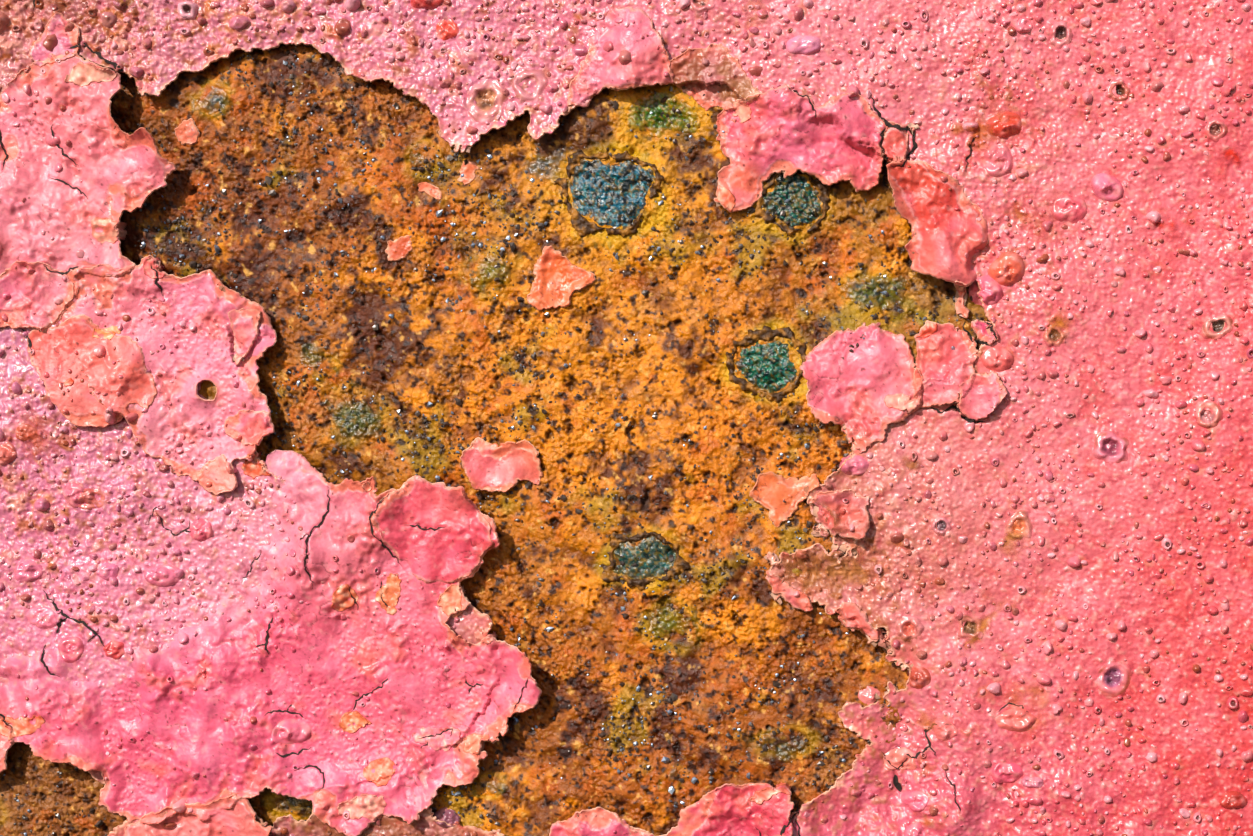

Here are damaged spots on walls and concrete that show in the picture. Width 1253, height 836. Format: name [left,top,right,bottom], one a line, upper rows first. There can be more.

peeling [567,7,1008,454]
peeling [527,246,596,311]
peeling [0,12,543,836]
rust [109,43,989,836]
peeling [749,471,870,540]
peeling [766,570,814,612]
peeling [835,602,889,641]
rust [0,742,127,836]
peeling [549,807,644,836]
peeling [660,782,794,836]